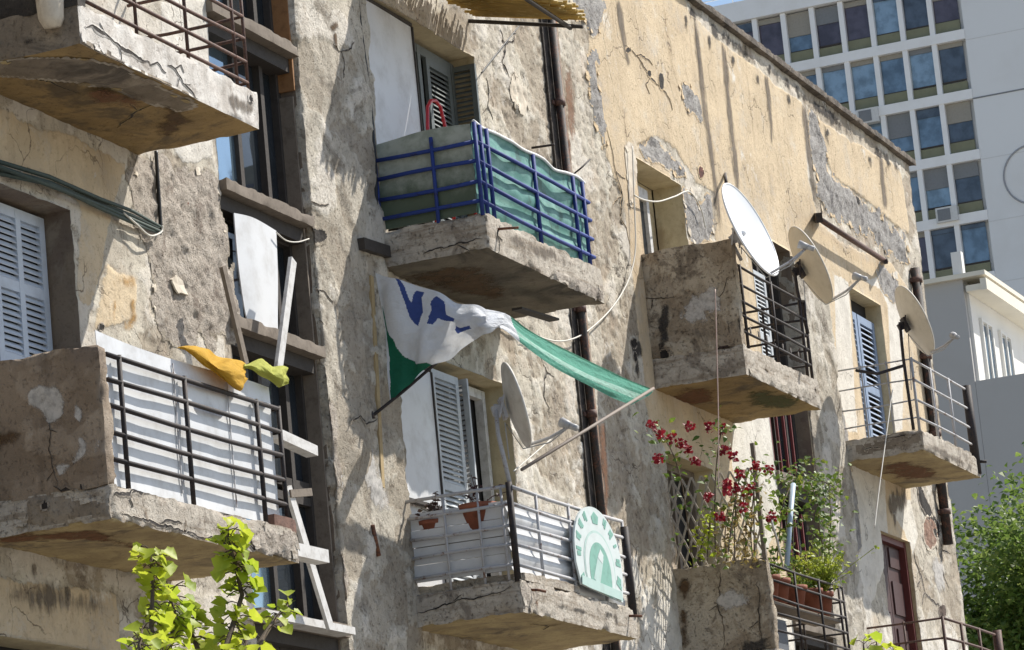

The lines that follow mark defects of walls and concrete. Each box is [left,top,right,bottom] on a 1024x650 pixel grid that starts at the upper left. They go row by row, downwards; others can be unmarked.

crack [85,23,196,98]
leakage [158,106,192,136]
crack [625,45,673,110]
peeling [679,81,703,123]
peeling [625,136,715,244]
peeling [808,109,911,304]
leakage [749,390,799,408]
crack [43,403,280,553]
rust [600,424,609,515]
crack [418,586,511,613]
crack [709,570,725,647]
crack [751,583,762,638]